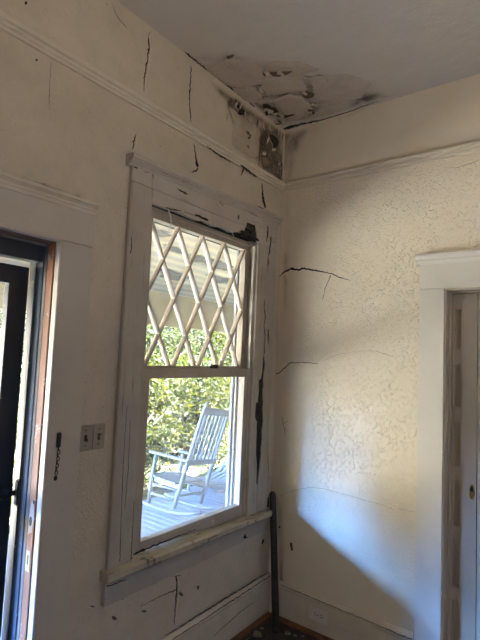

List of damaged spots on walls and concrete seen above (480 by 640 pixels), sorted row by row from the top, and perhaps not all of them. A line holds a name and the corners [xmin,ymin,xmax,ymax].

crack [143,33,152,92]
crack [184,51,271,121]
peeling [206,54,372,178]
crack [192,144,200,173]
crack [280,267,350,297]
crack [141,575,180,624]